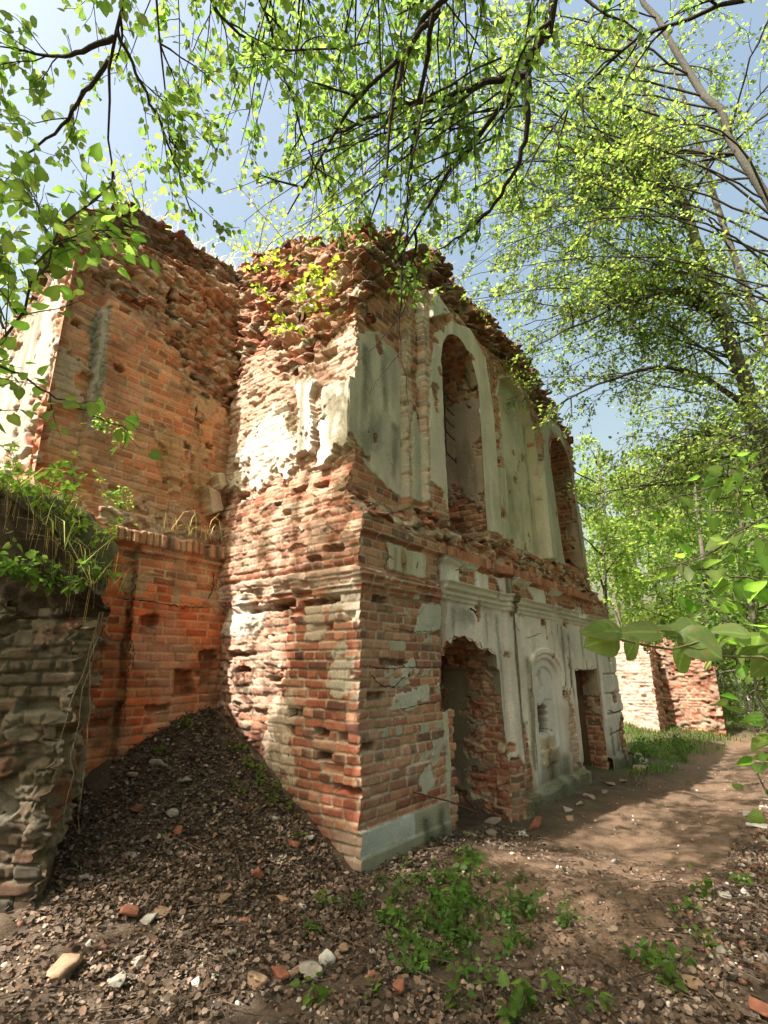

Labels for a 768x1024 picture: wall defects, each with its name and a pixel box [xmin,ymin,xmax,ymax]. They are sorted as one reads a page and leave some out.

spalling [0,203,609,619]
crack [117,563,217,730]
crack [361,664,440,712]
spalling [0,767,67,847]
peeling [508,708,542,821]